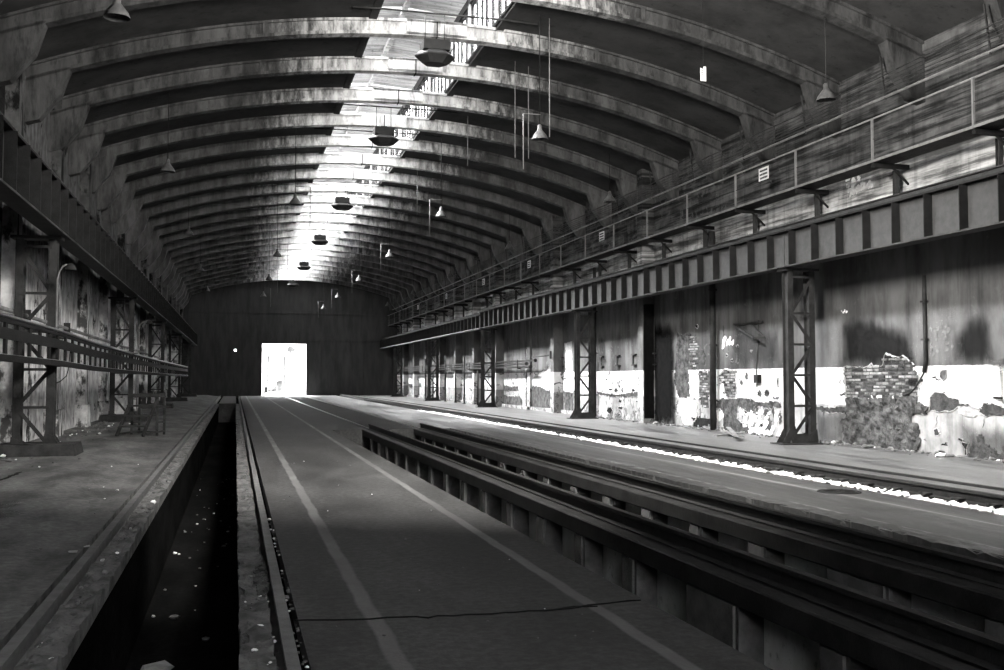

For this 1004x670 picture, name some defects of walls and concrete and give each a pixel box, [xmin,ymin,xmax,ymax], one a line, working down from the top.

flaking render [674,324,783,436]
flaking render [816,352,1004,454]
flaking render [957,434,1004,460]